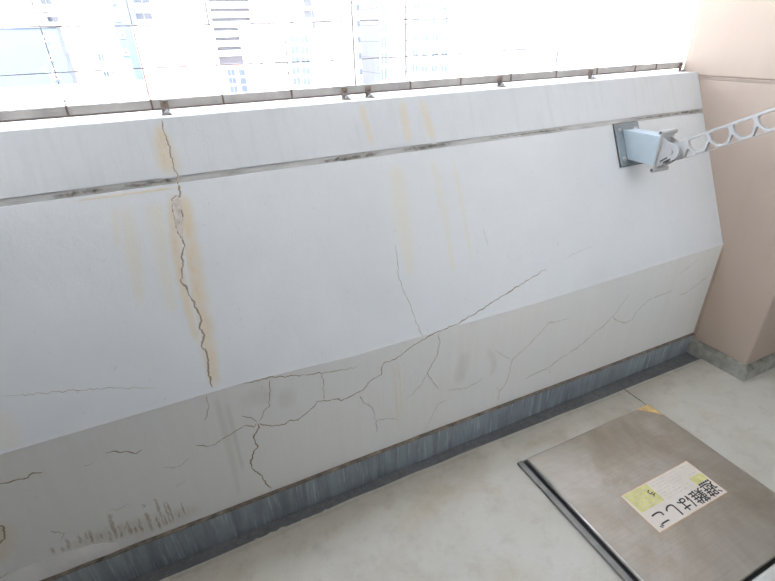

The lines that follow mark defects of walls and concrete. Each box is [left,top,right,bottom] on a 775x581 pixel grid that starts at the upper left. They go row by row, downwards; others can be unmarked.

rust [70,122,223,389]
crack [161,119,213,421]
crack [8,387,148,396]
crack [164,246,706,489]
crack [0,472,42,484]
crack [0,525,8,544]
water stain [49,497,205,555]